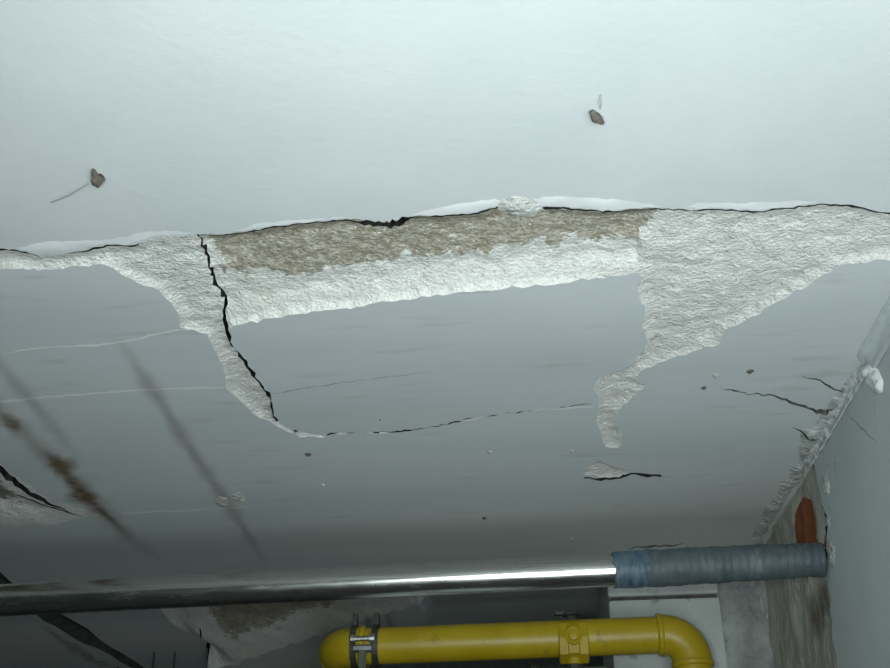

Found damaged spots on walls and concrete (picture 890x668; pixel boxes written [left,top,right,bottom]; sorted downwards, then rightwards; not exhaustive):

crack [542,204,890,214]
crack [64,243,144,255]
crack [197,206,498,435]
spalling [0,196,890,448]
crack [0,387,227,403]
crack [723,376,877,440]
spalling [0,463,100,526]
crack [0,465,241,517]
spalling [583,459,629,477]
spalling [161,596,419,668]